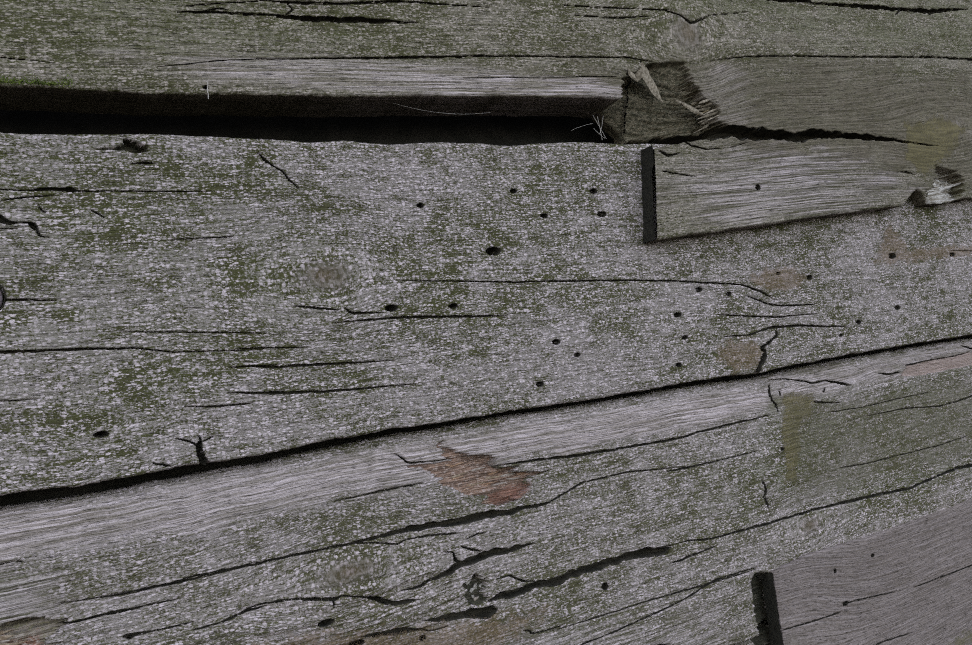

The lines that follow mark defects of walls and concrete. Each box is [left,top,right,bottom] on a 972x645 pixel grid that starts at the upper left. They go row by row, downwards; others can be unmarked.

crack [175,0,485,24]
crack [557,0,965,24]
crack [258,152,297,187]
crack [0,187,200,237]
peeling [445,460,525,491]
crack [60,280,972,645]